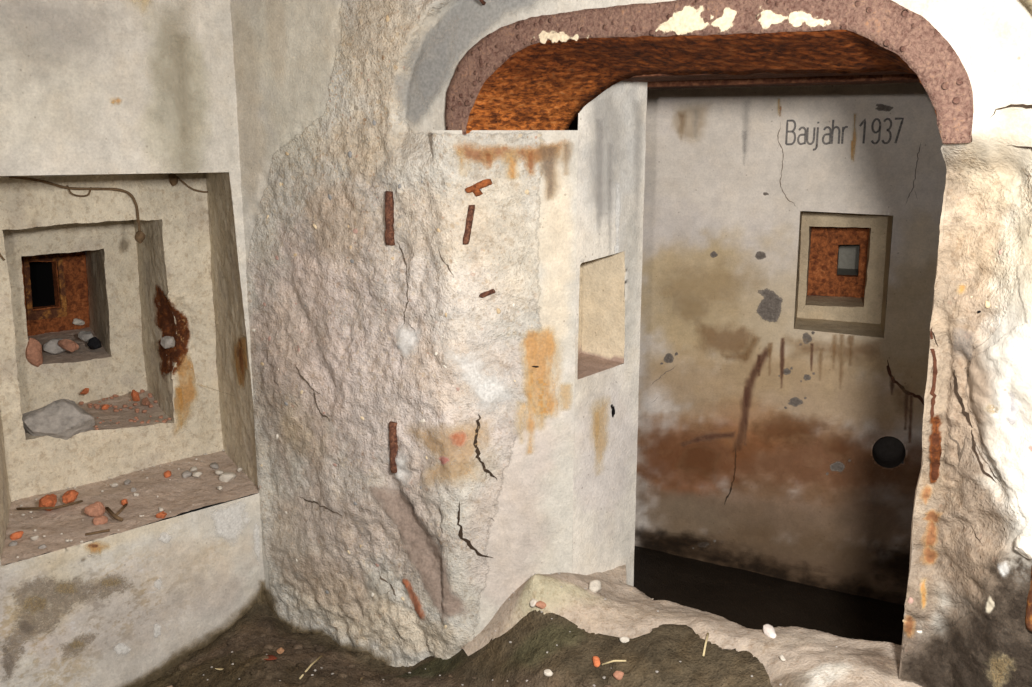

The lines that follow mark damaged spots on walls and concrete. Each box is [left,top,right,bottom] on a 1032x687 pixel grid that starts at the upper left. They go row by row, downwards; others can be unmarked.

crack [990,104,1032,118]
spalling [246,0,544,667]
crack [473,414,497,479]
crack [930,328,1007,494]
crack [457,502,493,558]
water stain [636,531,910,605]
water stain [901,556,1032,687]